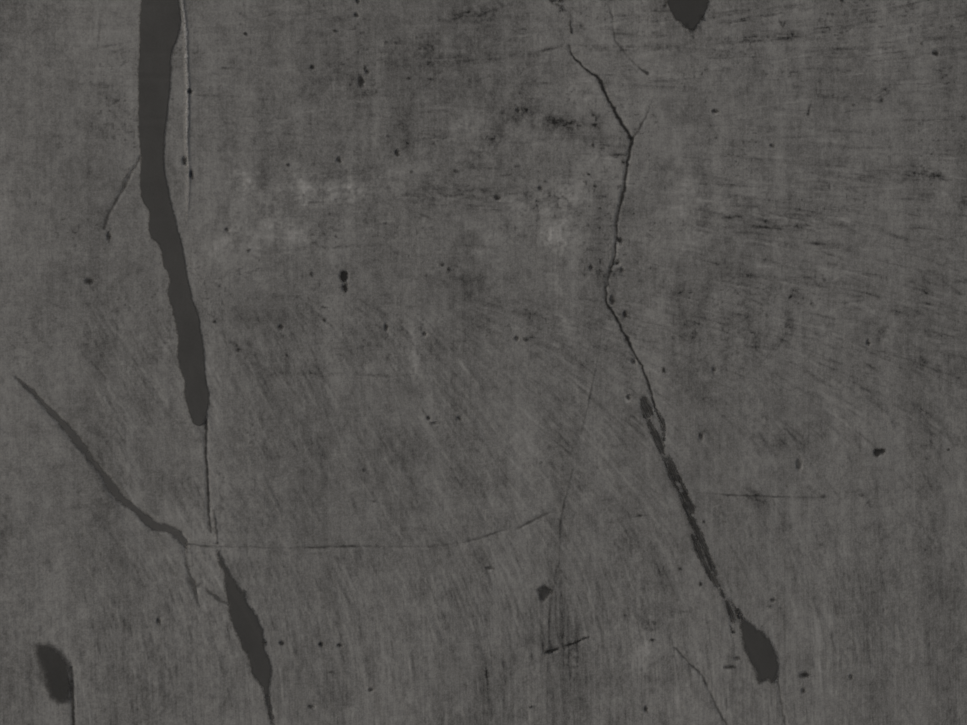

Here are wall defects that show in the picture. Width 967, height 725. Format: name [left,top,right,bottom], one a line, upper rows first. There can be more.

water stain [667,0,709,30]
water stain [138,0,209,426]
crack [570,26,657,410]
crack [17,378,228,604]
water stain [217,552,273,719]
water stain [740,618,779,683]